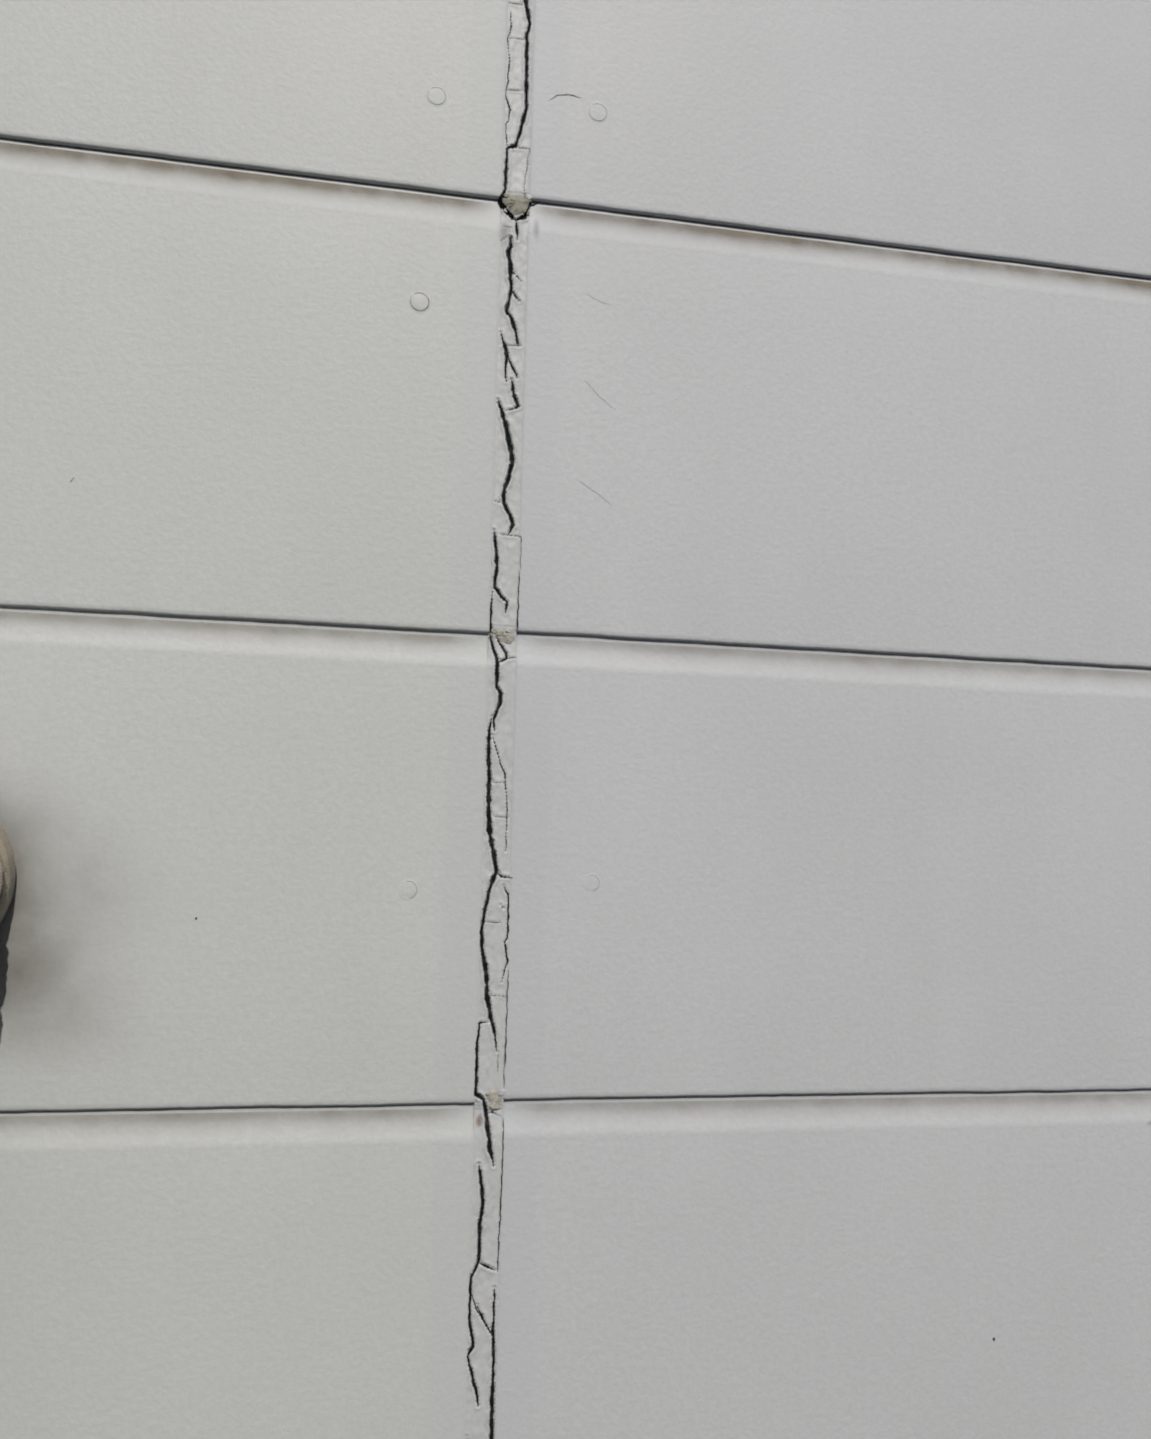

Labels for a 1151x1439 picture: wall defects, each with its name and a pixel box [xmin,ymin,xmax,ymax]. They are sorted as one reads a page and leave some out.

crack [467,0,539,1439]